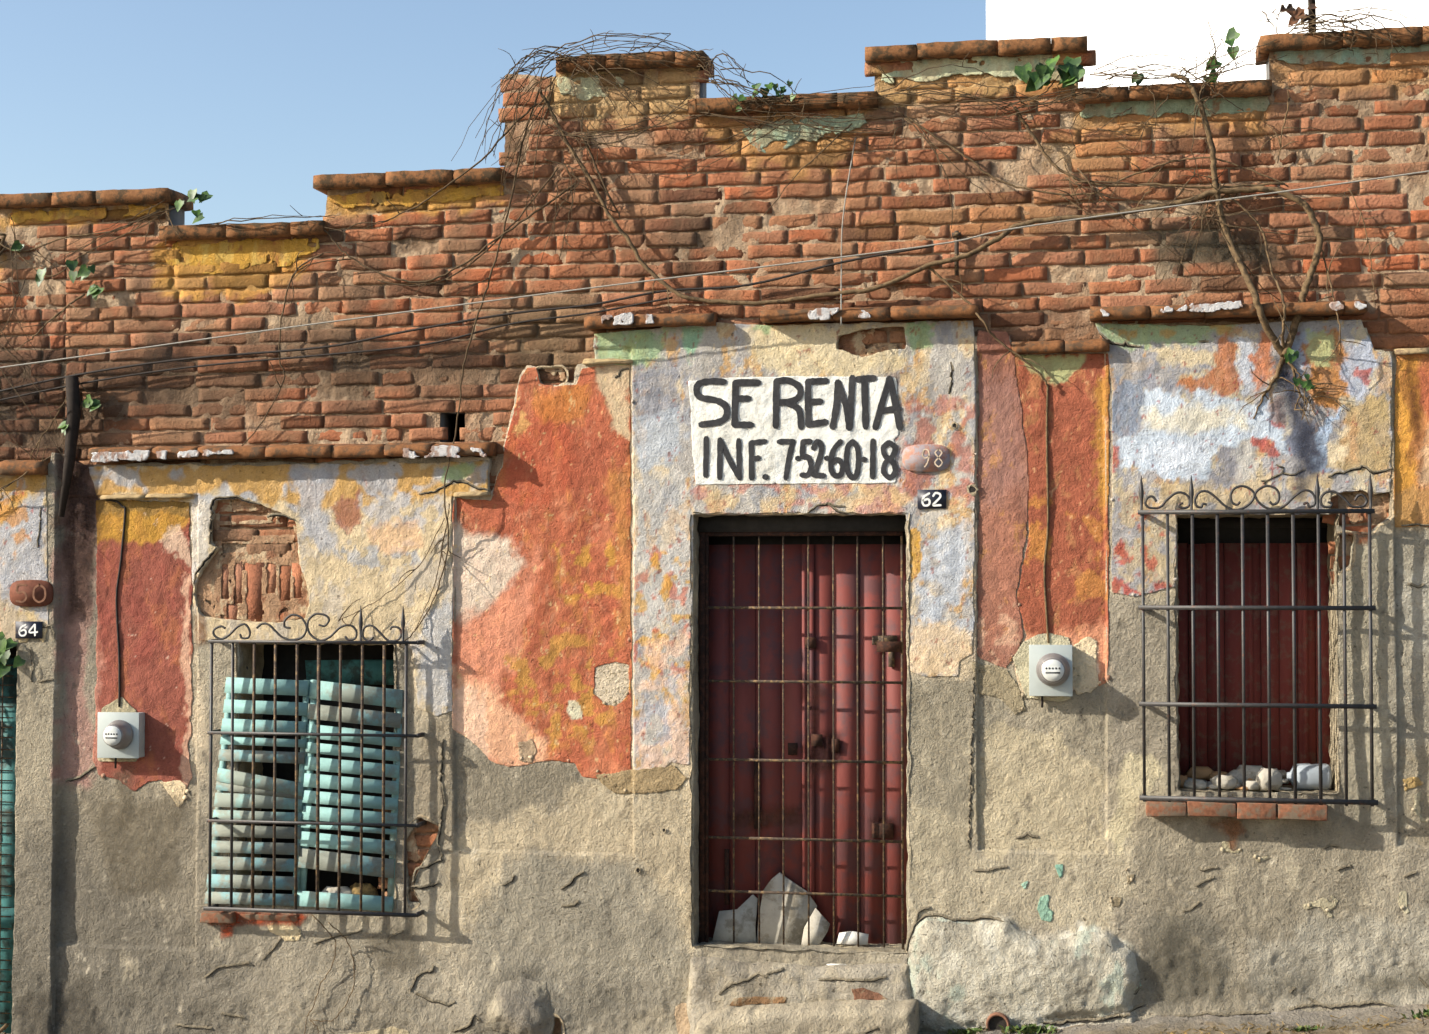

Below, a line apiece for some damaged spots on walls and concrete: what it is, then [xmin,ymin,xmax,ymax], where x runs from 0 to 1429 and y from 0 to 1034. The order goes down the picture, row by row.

peeling [89,301,1429,807]
flaking render [402,815,443,911]
crack [204,929,404,979]
crack [174,1012,246,1029]
crack [409,965,481,1032]